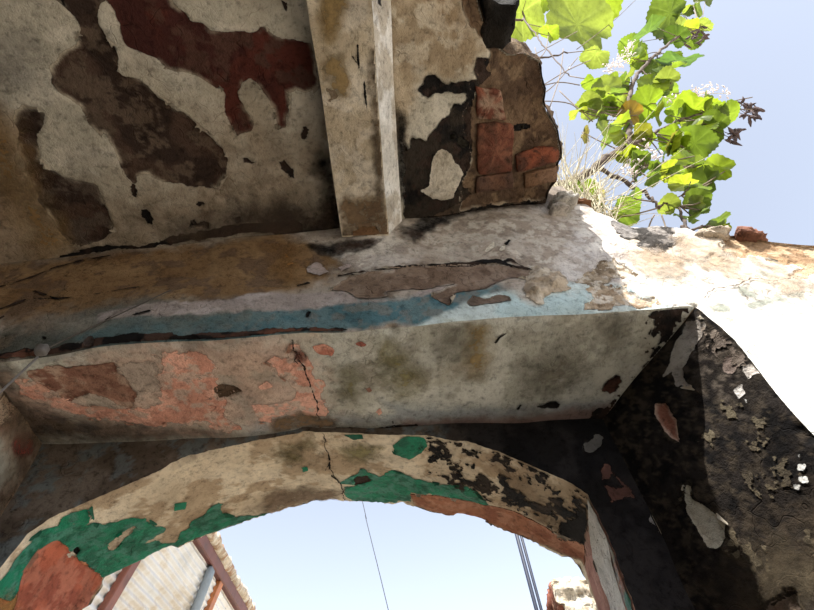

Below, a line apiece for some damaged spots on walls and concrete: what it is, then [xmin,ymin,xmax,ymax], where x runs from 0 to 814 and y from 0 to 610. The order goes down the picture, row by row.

spalling [421,37,592,216]
crack [0,222,303,319]
peeling [329,264,530,306]
peeling [15,351,242,434]
spalling [47,327,347,356]
peeling [251,343,329,424]
crack [292,340,355,500]
peeling [663,315,760,403]
peeling [0,503,267,610]
leakage [419,437,588,556]
peeling [681,485,728,549]
peeling [794,455,809,490]